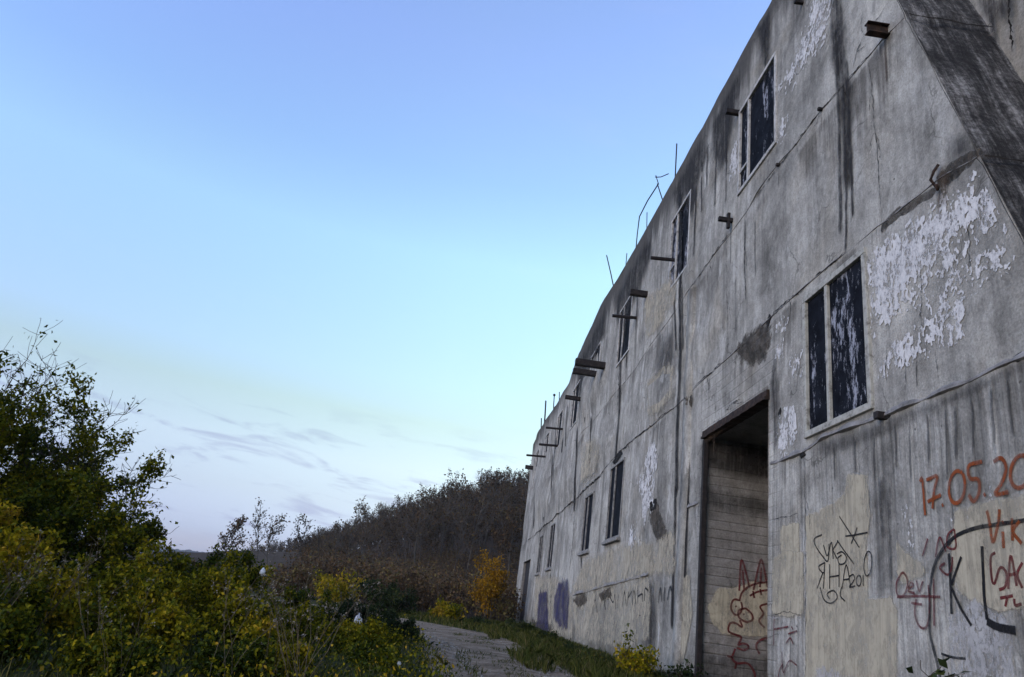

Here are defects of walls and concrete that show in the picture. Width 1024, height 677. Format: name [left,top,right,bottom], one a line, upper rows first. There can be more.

peeling [776,0,833,94]
damp [831,0,854,248]
peeling [866,147,1015,379]
peeling [775,405,806,459]
peeling [628,443,668,550]